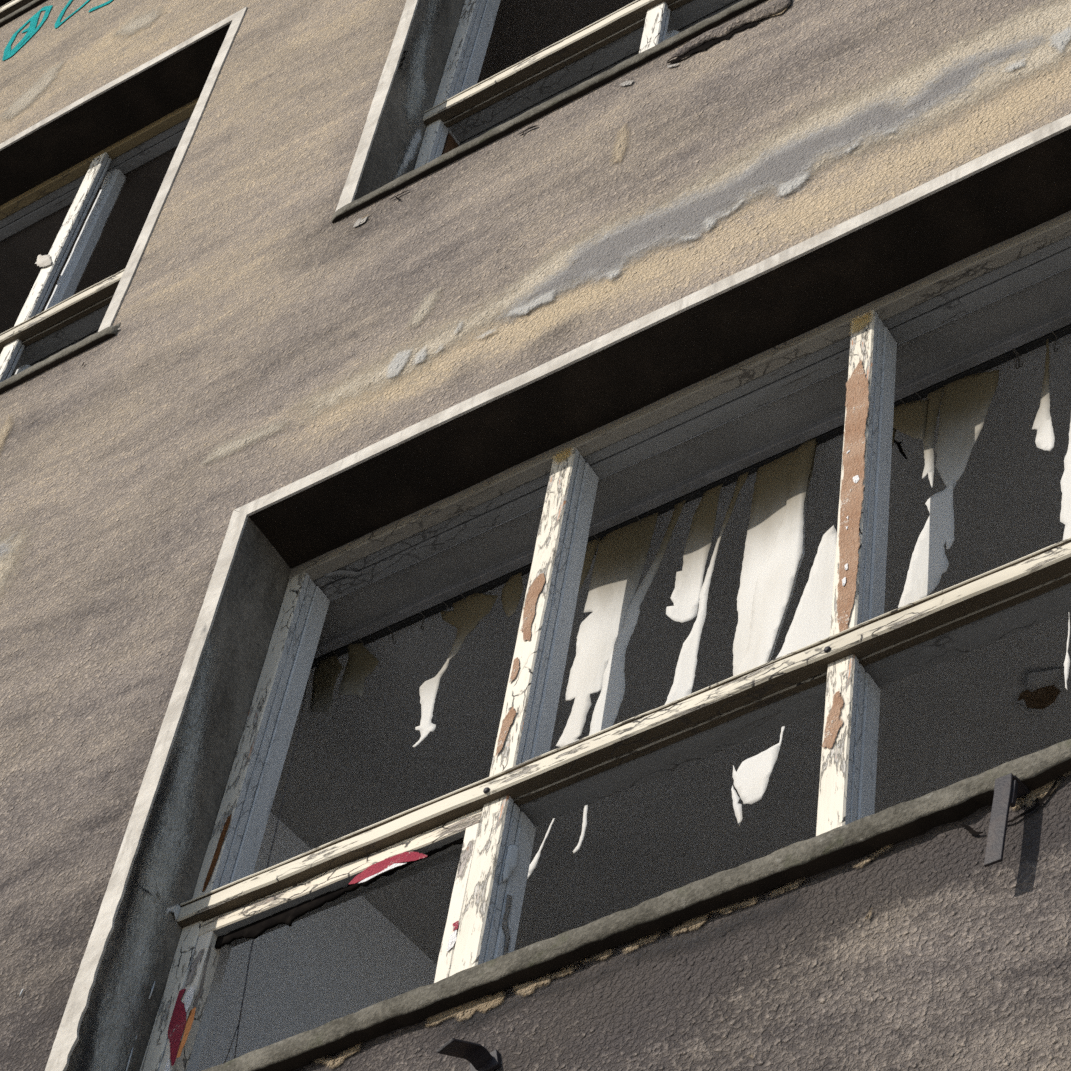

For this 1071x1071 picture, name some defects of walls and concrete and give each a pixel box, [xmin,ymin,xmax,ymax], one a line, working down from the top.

peeling [303,0,1071,417]
peeling [837,360,869,632]
peeling [521,573,545,641]
peeling [509,657,519,683]
peeling [822,691,843,748]
peeling [202,814,232,891]
spalling [855,844,892,867]
peeling [502,894,512,955]
spalling [672,898,758,934]
spalling [427,933,659,1026]
peeling [164,987,196,1071]
spalling [315,1044,361,1068]